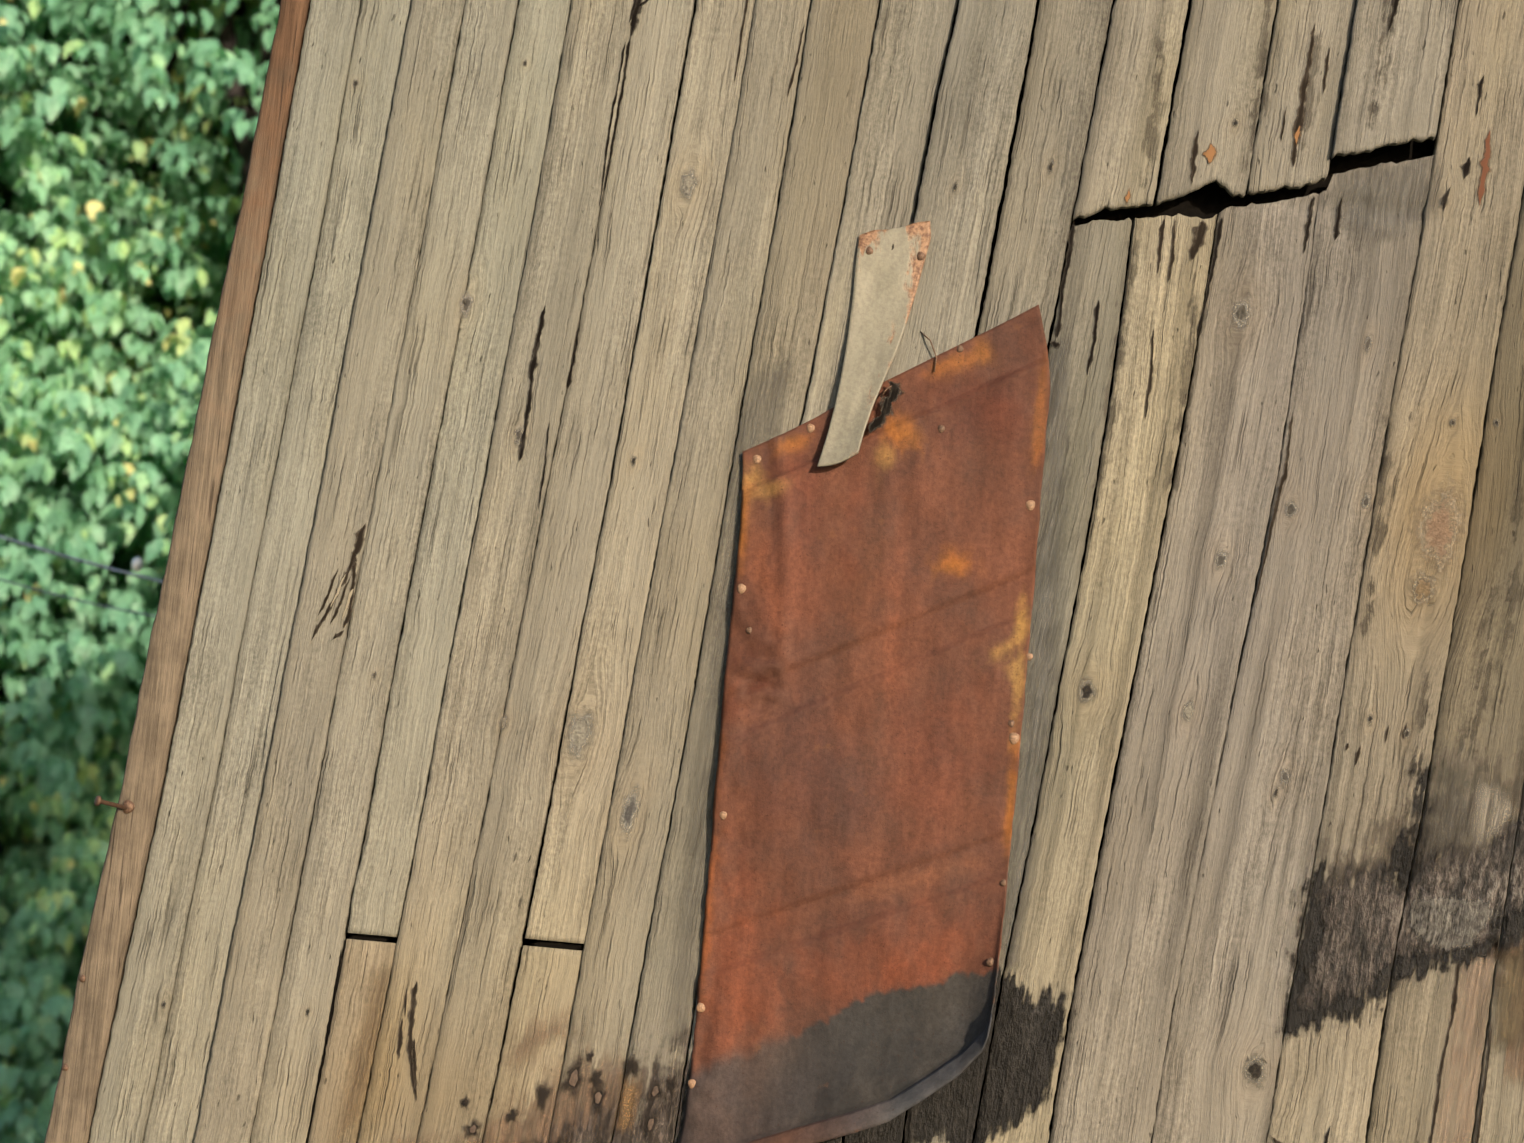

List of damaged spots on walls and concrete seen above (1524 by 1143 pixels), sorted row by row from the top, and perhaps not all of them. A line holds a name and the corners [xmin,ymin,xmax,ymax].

crack [1476,76,1484,115]
crack [1050,24,1471,375]
crack [1145,329,1154,419]
crack [1255,415,1293,599]
damp [1382,773,1472,891]
damp [1285,860,1334,1016]